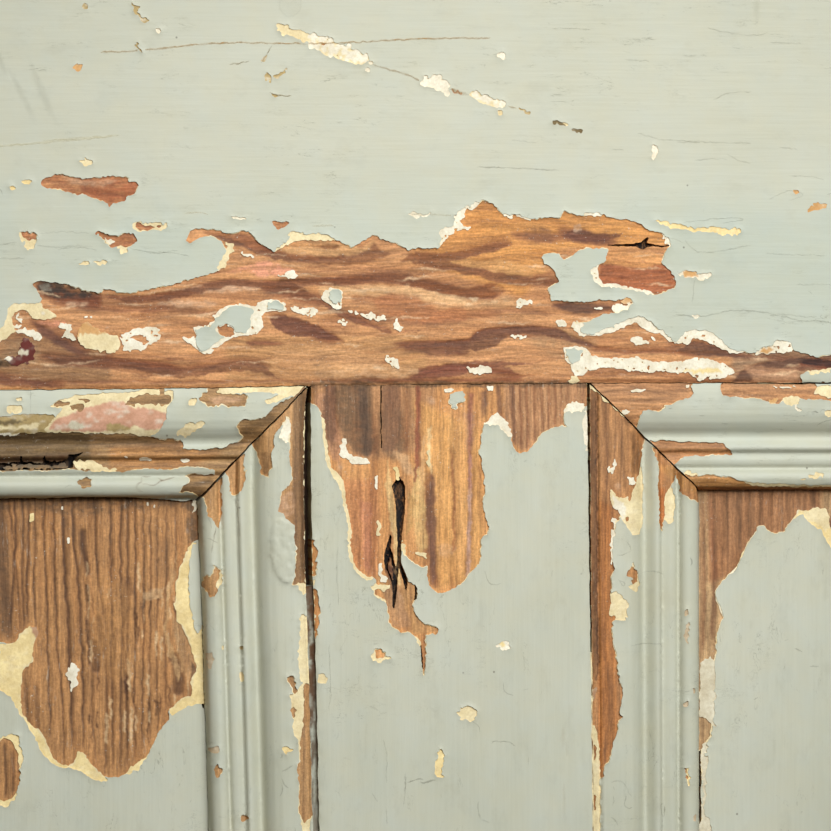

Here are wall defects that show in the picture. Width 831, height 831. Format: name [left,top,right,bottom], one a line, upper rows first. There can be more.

peeling [10,174,138,207]
peeling [0,200,831,831]